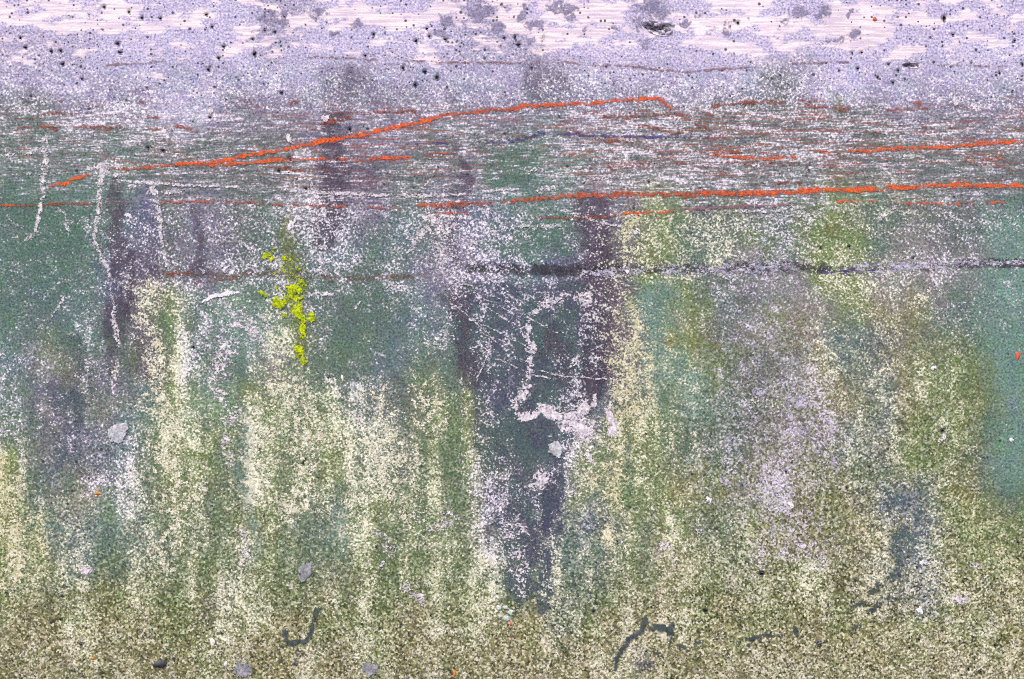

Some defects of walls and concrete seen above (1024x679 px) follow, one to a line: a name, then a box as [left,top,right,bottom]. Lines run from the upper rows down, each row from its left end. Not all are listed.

corrosion [17,100,122,130]
corrosion [319,109,416,125]
corrosion [580,100,782,134]
corrosion [590,139,695,171]
water stain [0,96,1024,614]